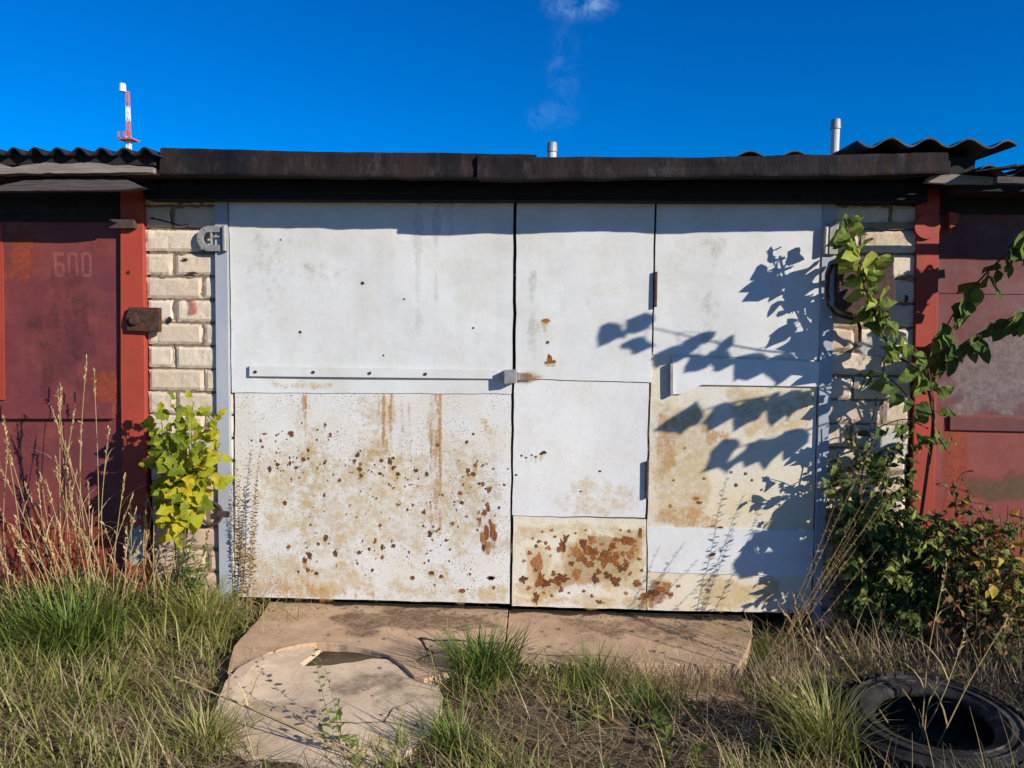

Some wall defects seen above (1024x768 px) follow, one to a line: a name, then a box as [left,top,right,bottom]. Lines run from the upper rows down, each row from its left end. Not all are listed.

rust [238,383,509,601]
rust [658,408,729,528]
rust [533,526,642,603]